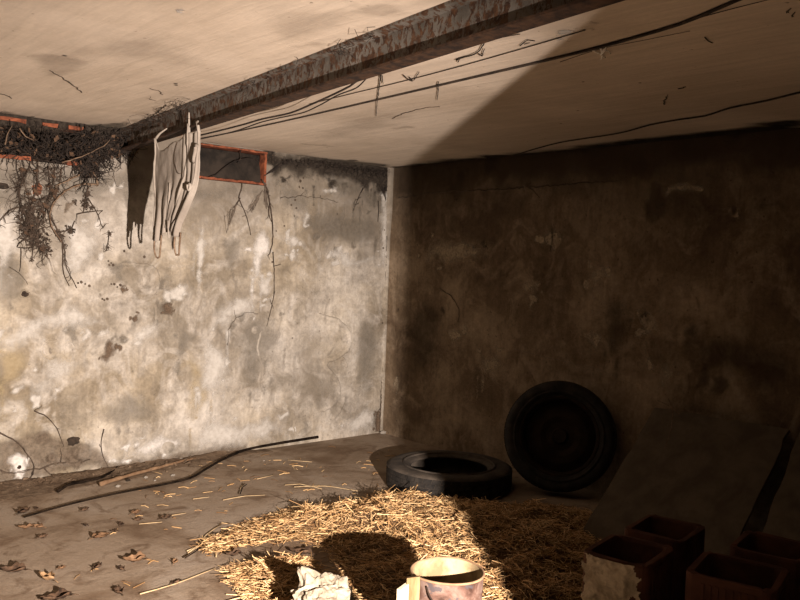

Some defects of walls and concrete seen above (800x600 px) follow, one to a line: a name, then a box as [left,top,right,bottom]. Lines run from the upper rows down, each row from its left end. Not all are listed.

leakage [265,150,388,266]
leakage [0,215,16,263]
leakage [68,219,103,269]
leakage [57,310,84,324]
leakage [83,327,154,345]
leakage [159,280,186,310]
efflorescence [213,234,271,330]
efflorescence [195,347,229,404]
leakage [341,411,377,430]
leakage [0,412,271,480]